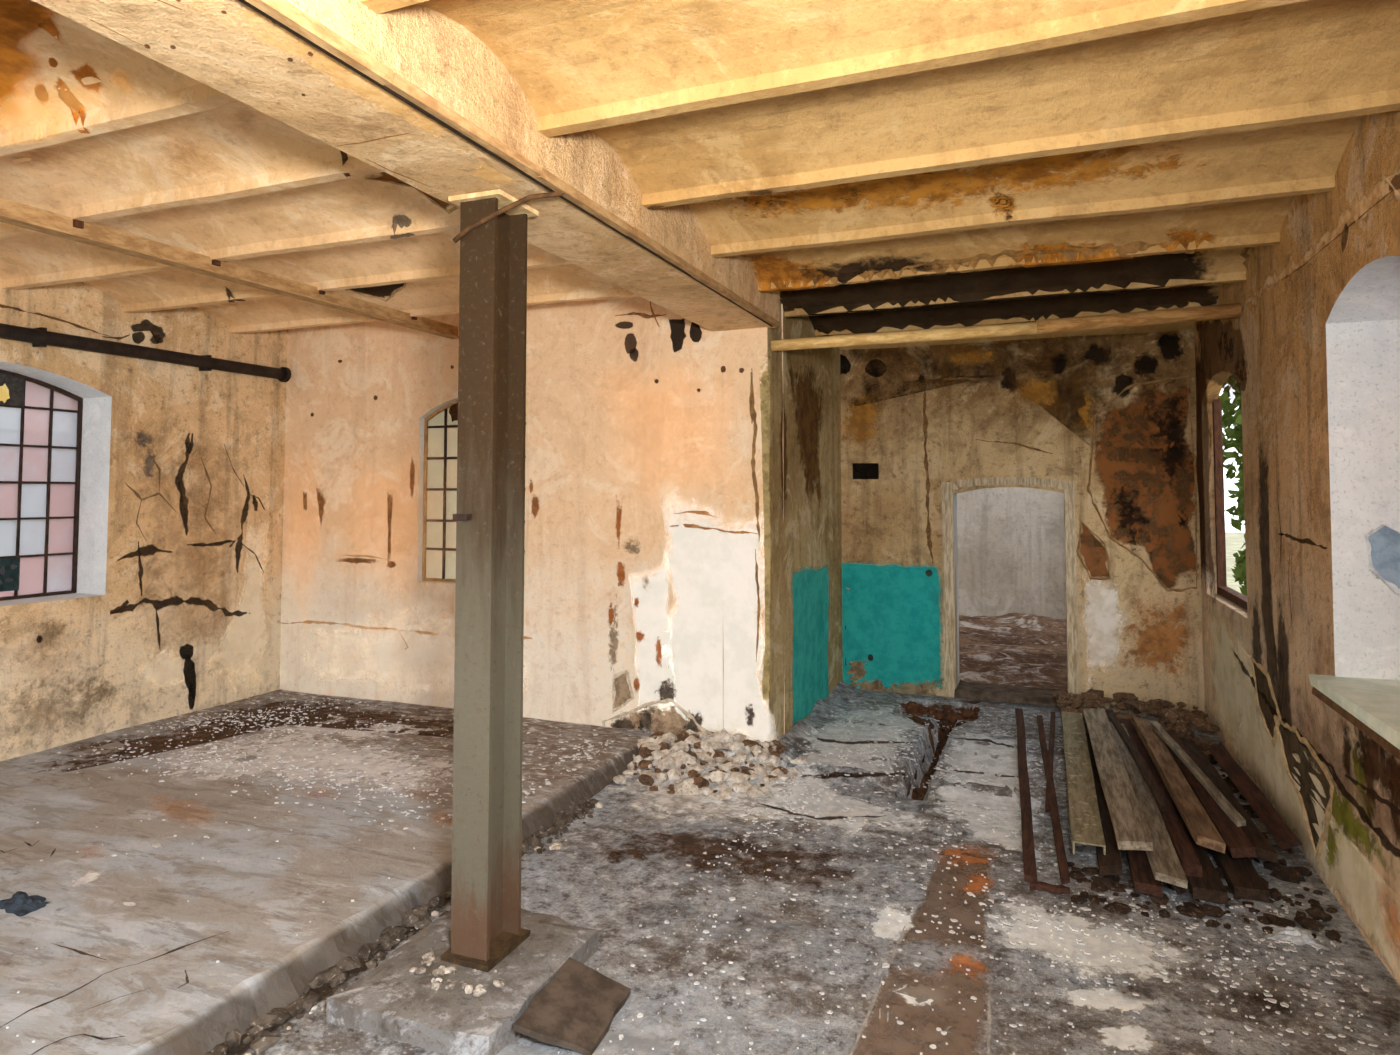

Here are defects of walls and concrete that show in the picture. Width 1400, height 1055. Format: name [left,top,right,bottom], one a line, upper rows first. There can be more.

flaking render [363,172,458,214]
crack [1284,190,1394,279]
spalling [690,322,702,342]
water stain [844,344,1178,442]
flaking render [1076,319,1247,592]
crack [110,433,455,650]
flaking render [760,352,771,699]
flaking render [602,670,706,736]
water stain [1124,604,1188,676]
water stain [1195,342,1400,983]
crack [1231,492,1400,857]
water stain [1235,992,1289,1014]